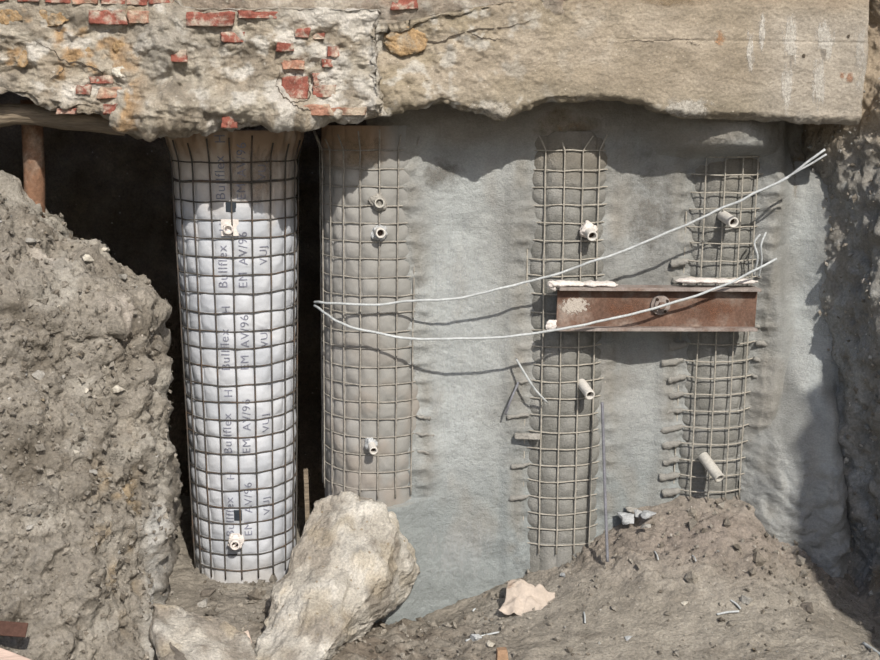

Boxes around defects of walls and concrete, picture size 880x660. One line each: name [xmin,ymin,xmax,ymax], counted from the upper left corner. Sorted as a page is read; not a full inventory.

spalling [0,0,174,26]
spalling [171,50,188,62]
spalling [186,10,278,43]
crack [427,17,541,43]
leakage [747,15,765,70]
leakage [812,22,835,101]
spalling [0,92,30,104]
spalling [75,75,122,115]
spalling [221,116,268,131]
spalling [0,124,23,188]
spalling [275,27,367,509]
spalling [43,127,192,496]